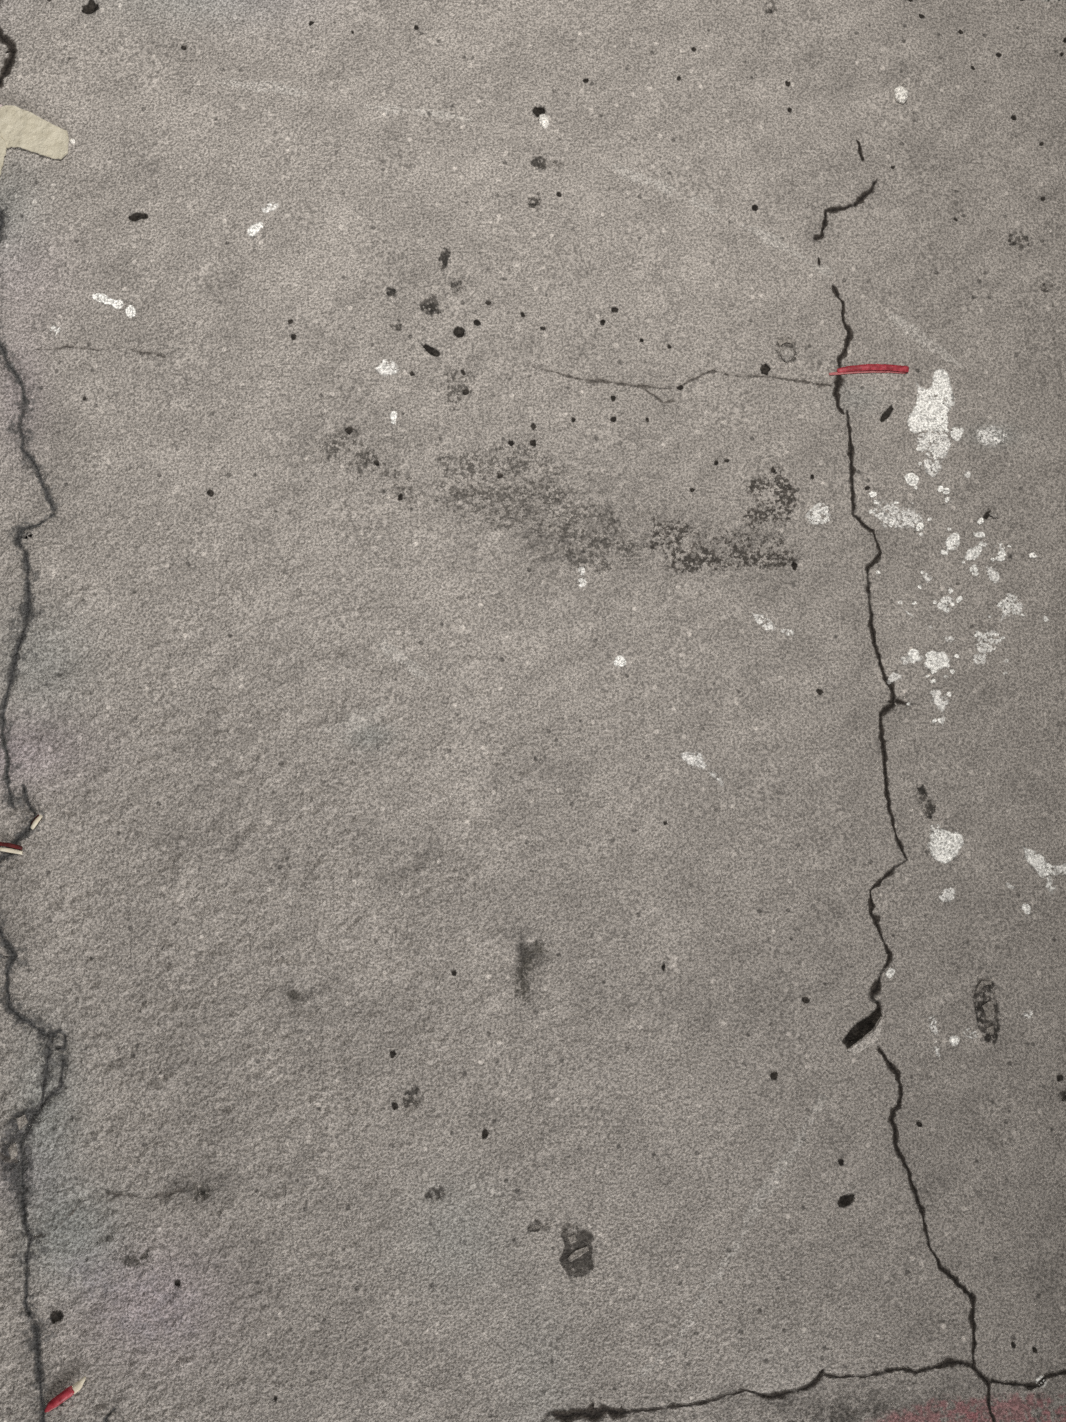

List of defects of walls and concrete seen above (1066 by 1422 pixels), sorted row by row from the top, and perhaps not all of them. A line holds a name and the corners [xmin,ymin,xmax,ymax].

crack [0,208,8,240]
crack [0,0,17,88]
crack [0,342,166,861]
crack [532,140,1066,1422]
crack [0,927,184,1422]